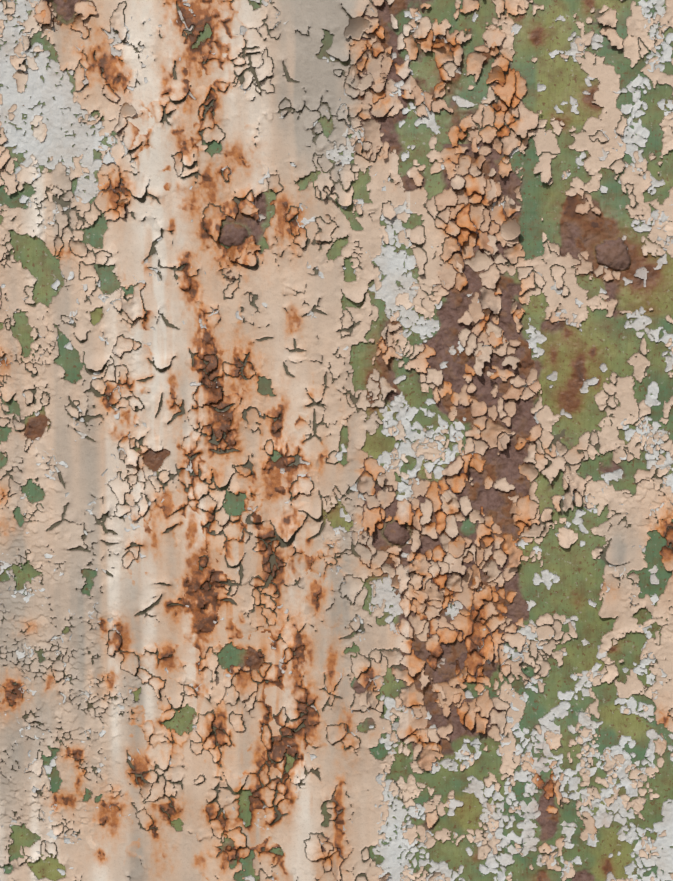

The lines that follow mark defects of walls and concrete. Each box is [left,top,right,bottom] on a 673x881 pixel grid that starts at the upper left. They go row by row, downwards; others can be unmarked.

peeling [0,42,91,210]
corrosion [160,0,225,161]
peeling [0,159,146,374]
peeling [54,316,143,410]
corrosion [167,140,308,491]
corrosion [556,192,648,277]
peeling [108,436,170,521]
corrosion [163,511,226,669]
corrosion [244,393,339,754]
peeling [627,526,673,595]
corrosion [333,777,347,862]
peeling [537,748,585,842]